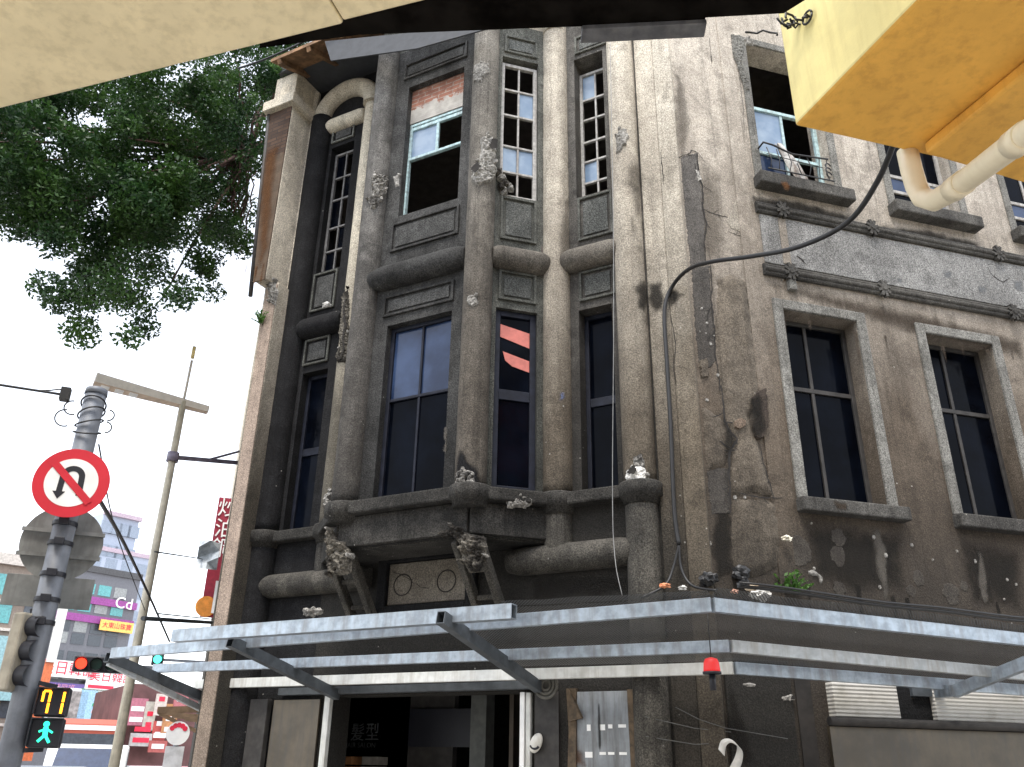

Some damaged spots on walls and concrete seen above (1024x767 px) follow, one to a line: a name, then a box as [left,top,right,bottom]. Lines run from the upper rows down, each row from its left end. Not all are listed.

spalling [471,131,514,196]
spalling [614,126,629,154]
spalling [365,171,401,209]
spalling [335,286,350,363]
crack [661,150,781,513]
leakage [751,397,765,436]
spalling [625,454,650,480]
spalling [506,493,532,509]
spalling [323,527,355,578]
spalling [438,523,489,573]